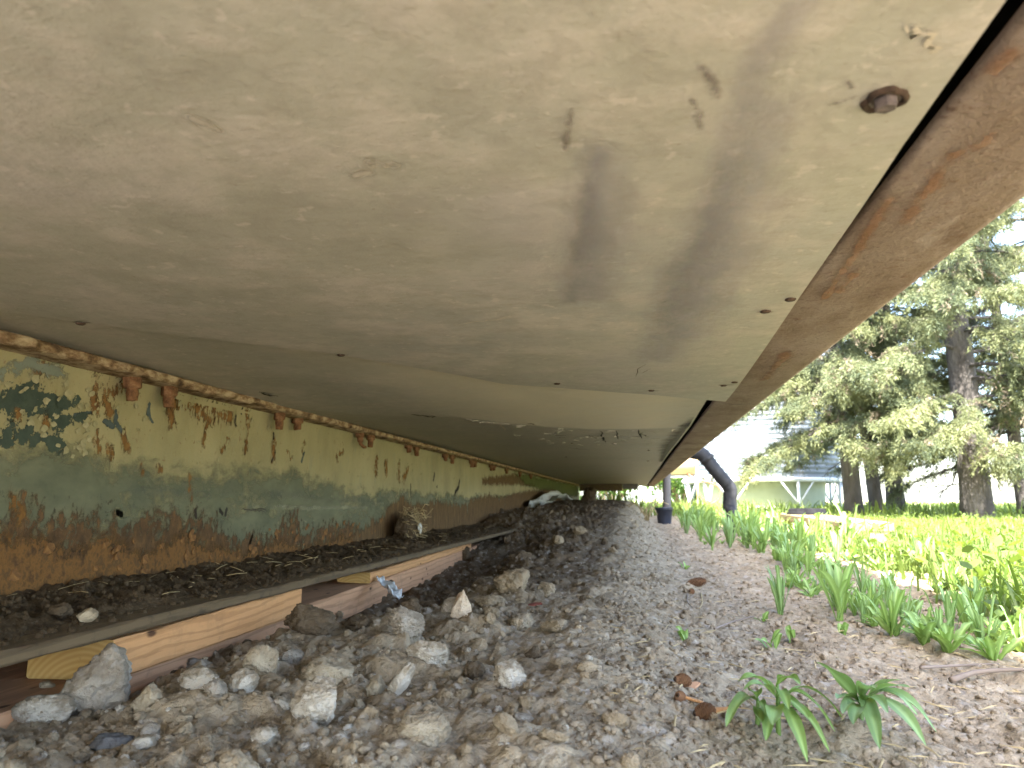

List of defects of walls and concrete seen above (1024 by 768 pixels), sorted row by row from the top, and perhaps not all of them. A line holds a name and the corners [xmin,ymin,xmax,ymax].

peeling [0,356,154,458]
rust [90,371,131,461]
rust [166,391,250,455]
rust [0,473,562,595]